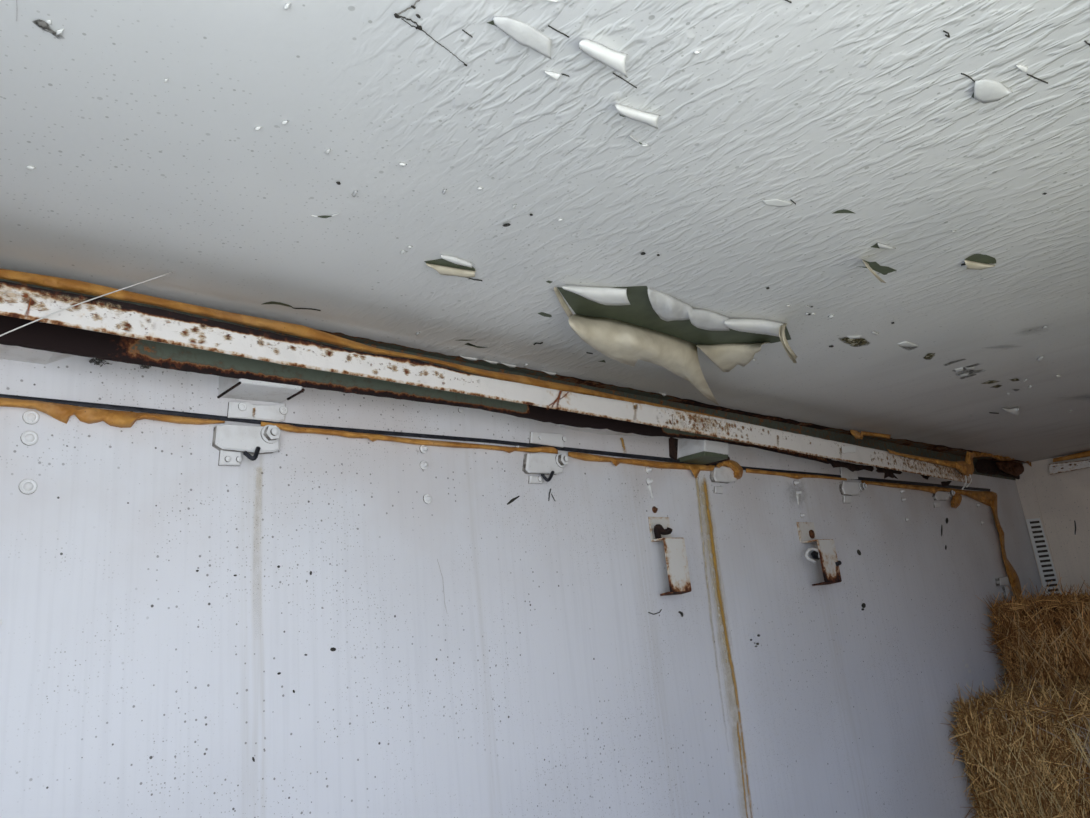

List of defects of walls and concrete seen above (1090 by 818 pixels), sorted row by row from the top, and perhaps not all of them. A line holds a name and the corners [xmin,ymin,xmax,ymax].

crack [394,0,473,66]
peeling [487,16,569,81]
peeling [579,39,637,88]
peeling [961,73,1013,103]
peeling [615,103,661,129]
peeling [424,254,482,281]
rust [0,284,149,334]
rust [164,320,334,357]
rust [346,354,471,385]
peeling [319,281,1033,464]
rust [661,411,789,440]
rust [975,459,1024,479]